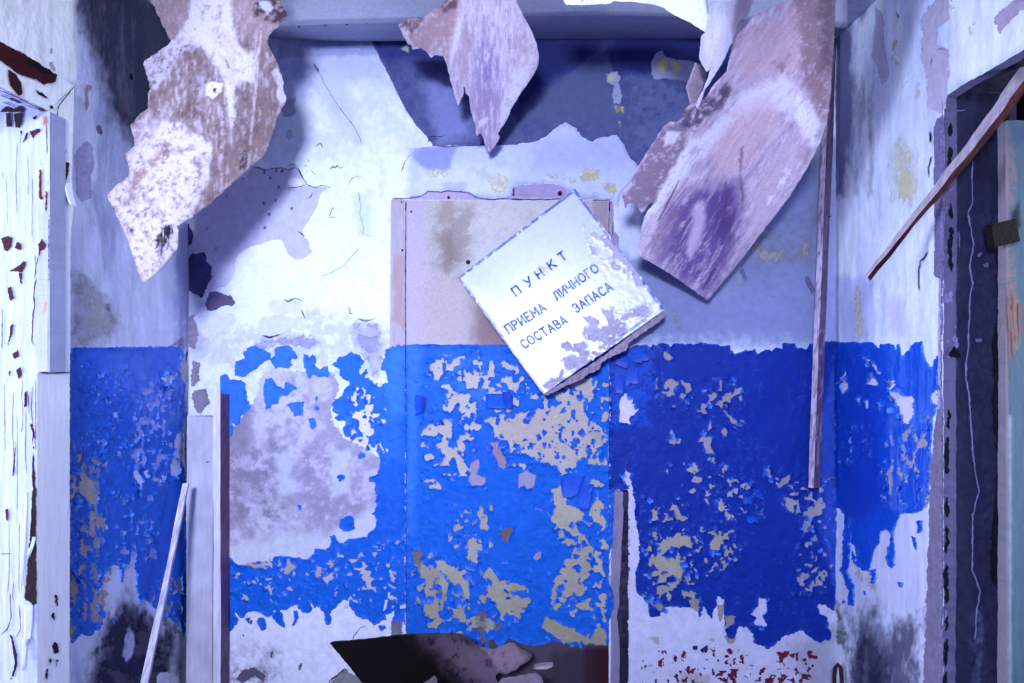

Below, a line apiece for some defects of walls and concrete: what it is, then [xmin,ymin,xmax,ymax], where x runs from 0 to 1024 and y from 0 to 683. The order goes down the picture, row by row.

spalling [512,183,568,197]
peeling [51,314,210,640]
leakage [90,603,174,683]
flaking render [229,368,531,683]
flaking render [421,349,836,683]
leakage [851,606,925,683]